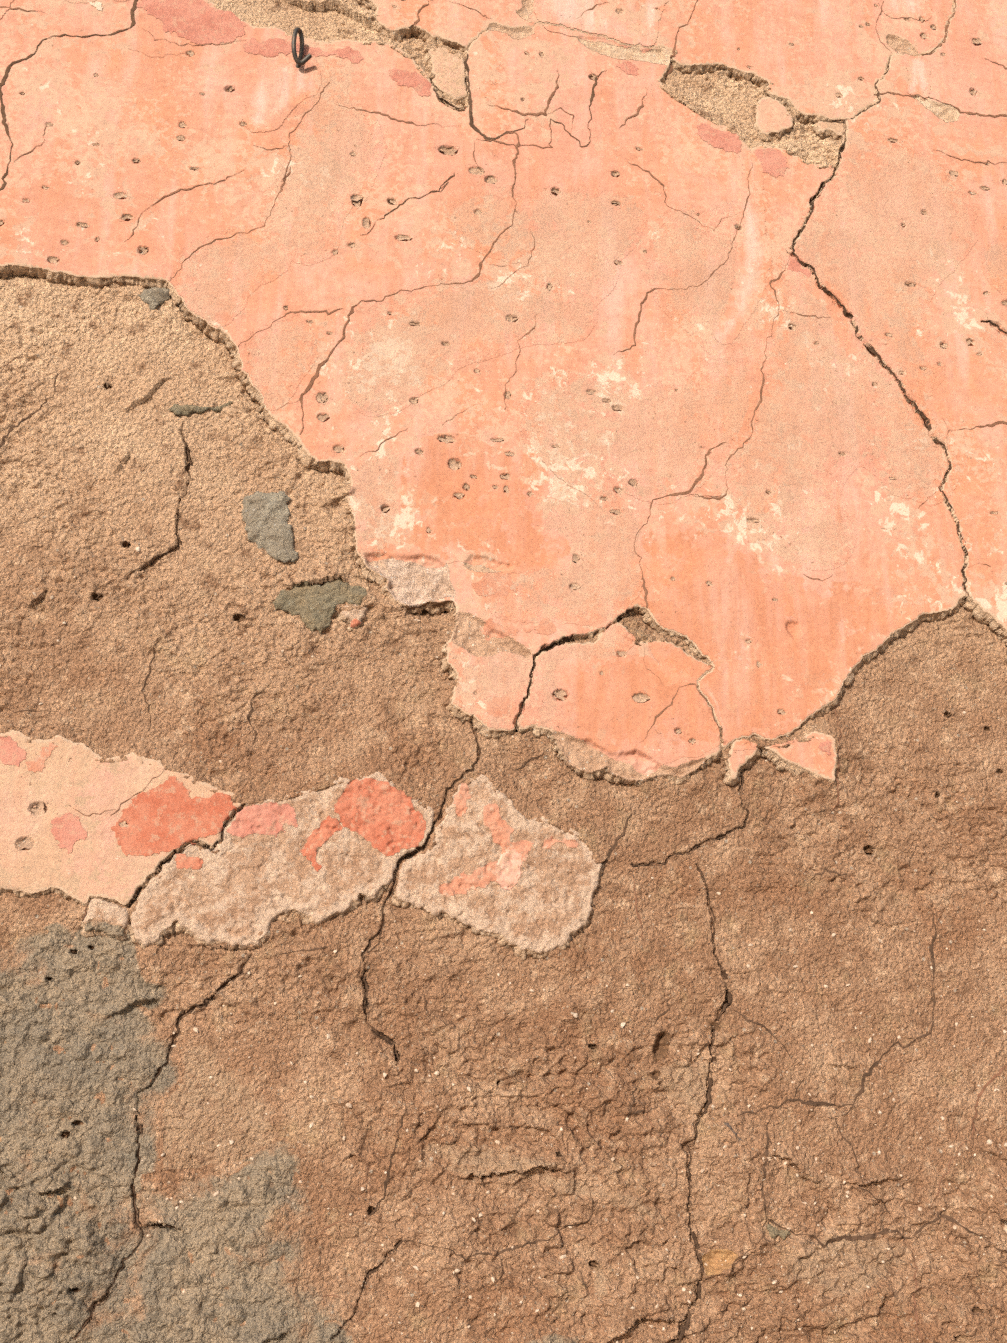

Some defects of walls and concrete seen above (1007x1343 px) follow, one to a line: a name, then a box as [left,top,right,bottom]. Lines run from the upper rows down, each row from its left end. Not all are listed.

crack [0,0,241,190]
crack [96,424,193,599]
crack [125,0,698,434]
peeling [0,0,1007,787]
crack [516,0,1007,737]
crack [129,803,245,906]
crack [68,947,326,1343]
crack [317,721,480,1236]
crack [314,1180,593,1339]
spalling [648,1030,670,1080]
spalling [700,1249,738,1276]
crack [597,769,1007,1343]